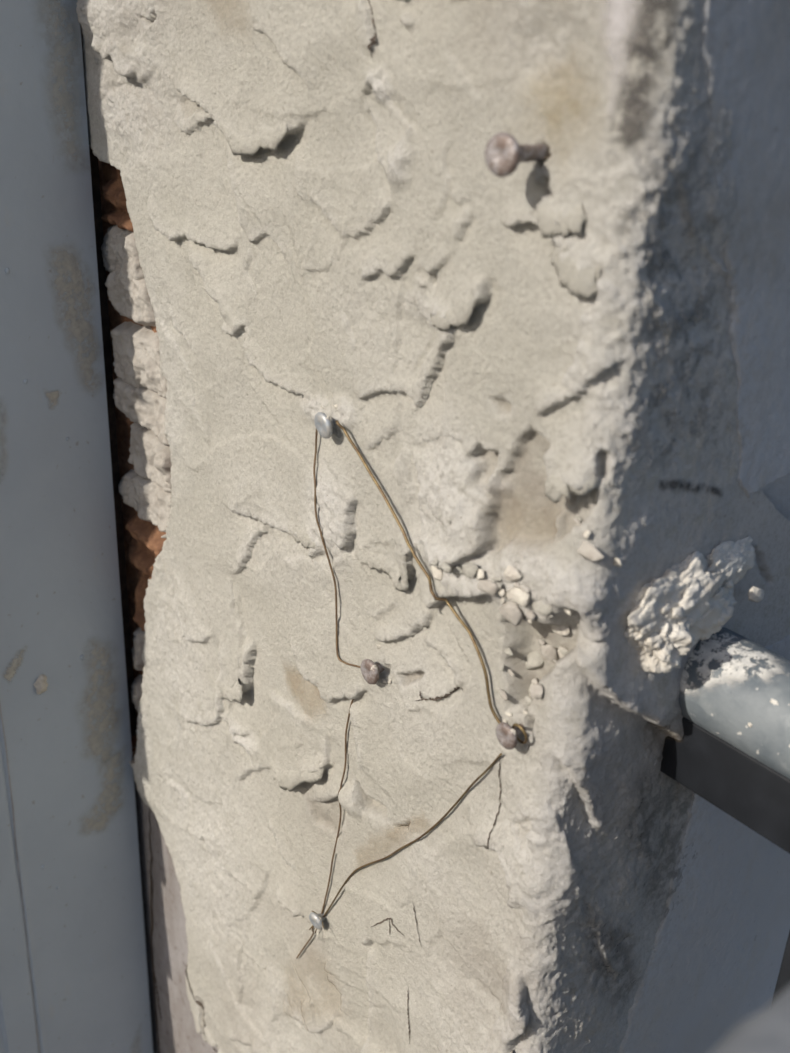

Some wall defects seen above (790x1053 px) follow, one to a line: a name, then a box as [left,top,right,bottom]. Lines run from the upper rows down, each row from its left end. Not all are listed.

water stain [617,0,674,143]
spalling [98,159,172,764]